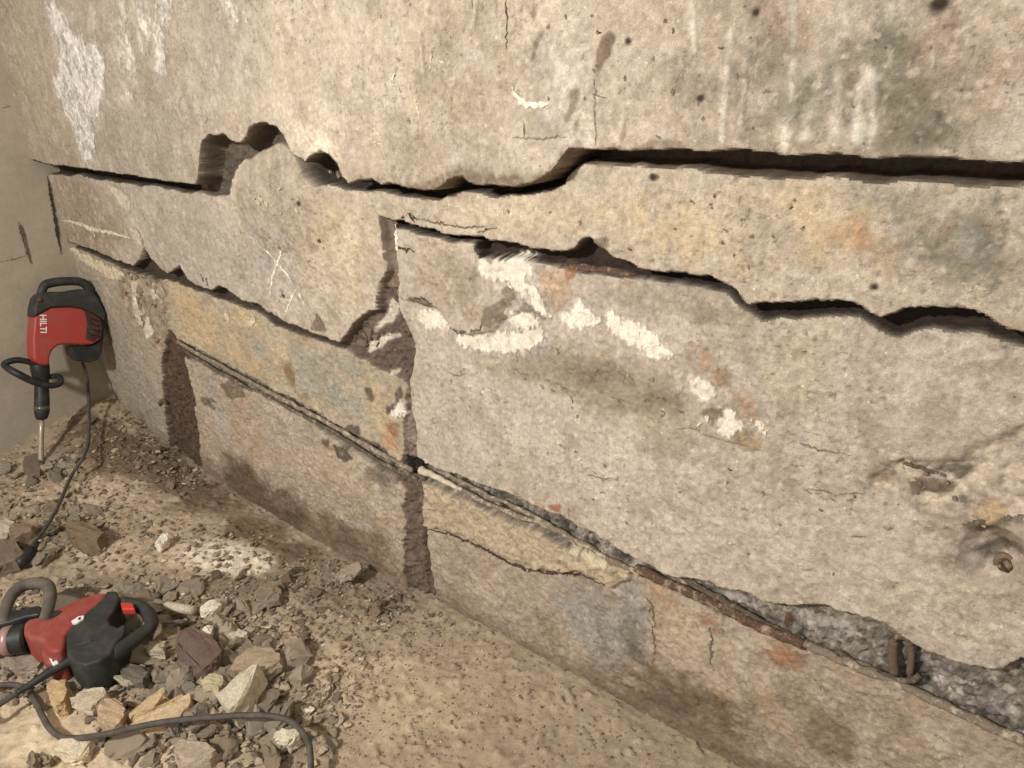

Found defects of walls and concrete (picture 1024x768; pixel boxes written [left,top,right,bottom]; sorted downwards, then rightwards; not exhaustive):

spalling [194,122,372,197]
spalling [413,164,568,190]
crack [337,64,1024,348]
crack [32,159,346,350]
leakage [468,265,561,359]
leakage [688,372,769,450]
crack [188,344,1024,740]